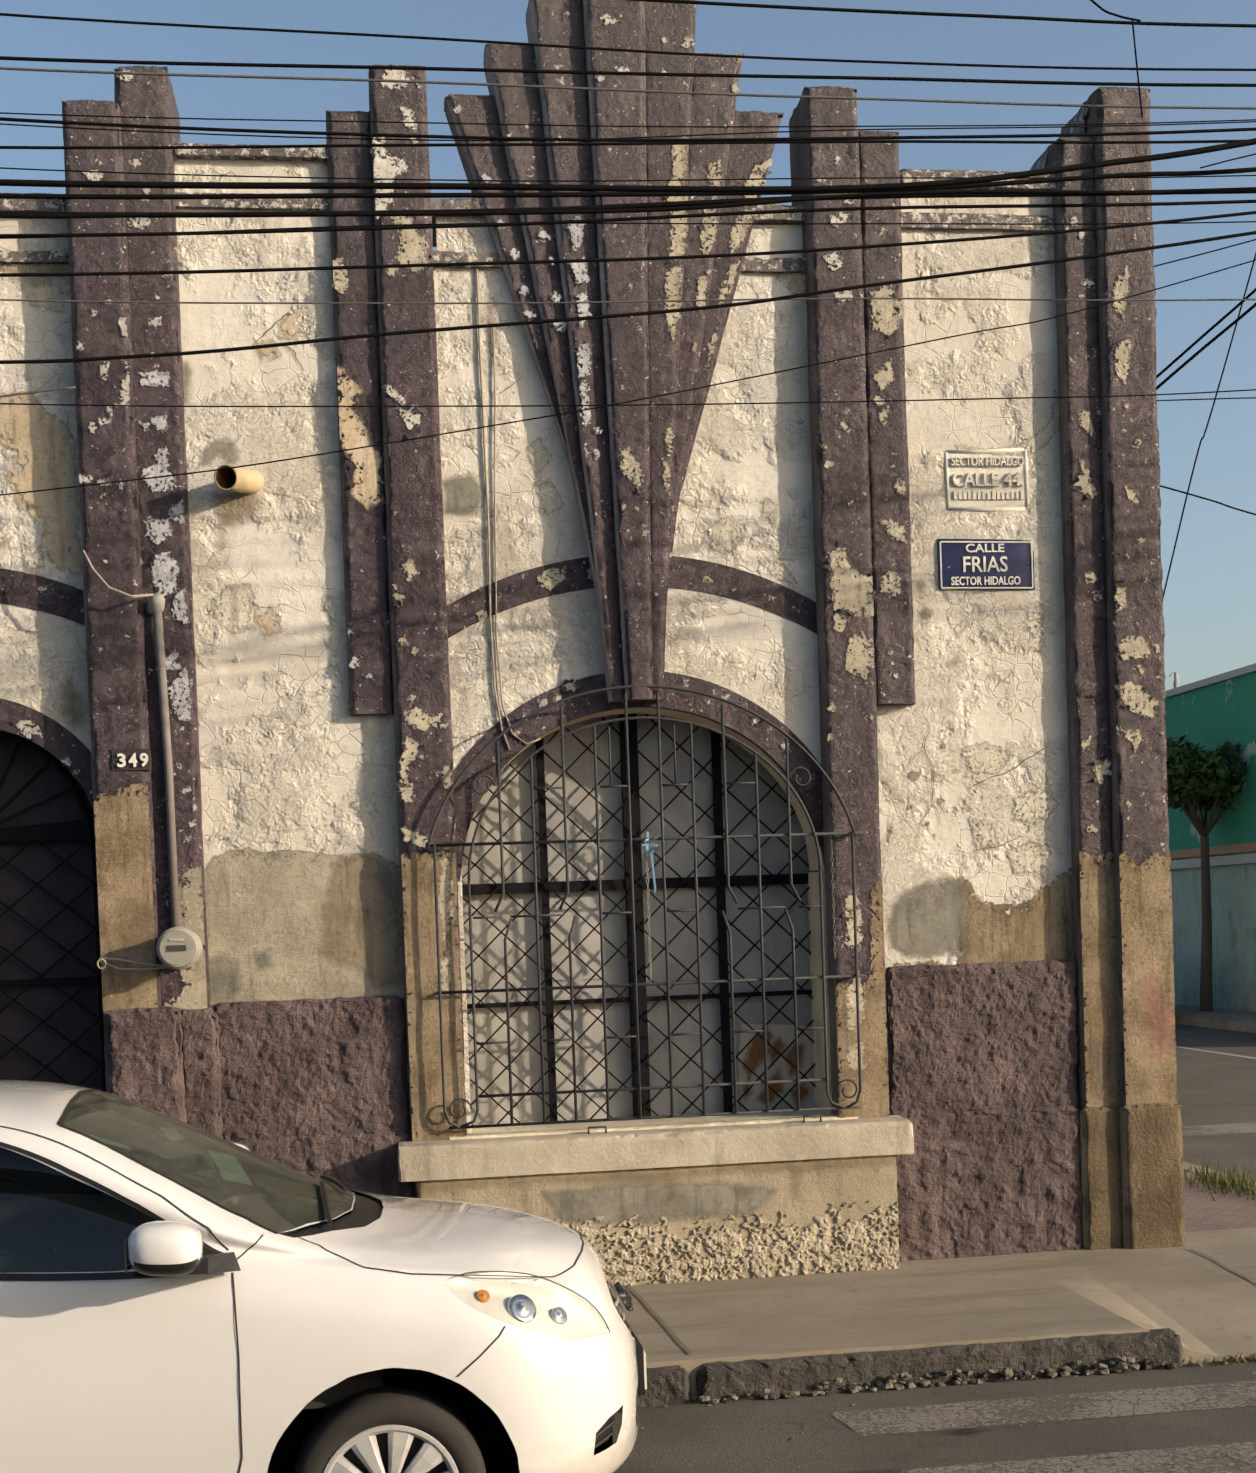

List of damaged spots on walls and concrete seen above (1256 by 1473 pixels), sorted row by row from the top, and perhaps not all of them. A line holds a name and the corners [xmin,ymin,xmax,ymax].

peeling [664,136,773,343]
peeling [823,251,905,338]
flaking render [0,362,190,624]
flaking render [337,367,382,510]
peeling [828,540,903,680]
peeling [396,694,450,802]
peeling [1081,634,1165,784]
damp [209,956,240,999]
damp [255,952,269,968]
damp [324,857,401,986]
flaking render [835,817,1177,1118]
corrosion [743,1030,809,1103]